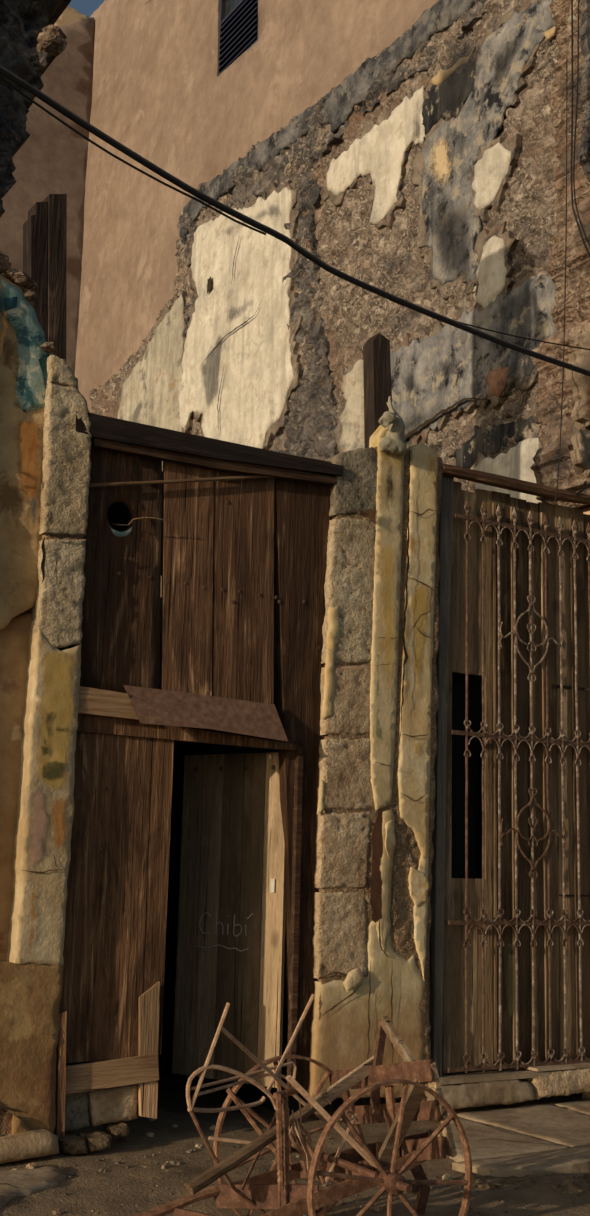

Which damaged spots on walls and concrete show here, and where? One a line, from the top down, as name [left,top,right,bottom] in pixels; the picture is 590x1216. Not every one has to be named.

peeling [113,180,304,450]
peeling [322,0,557,503]
spalling [385,809,429,954]